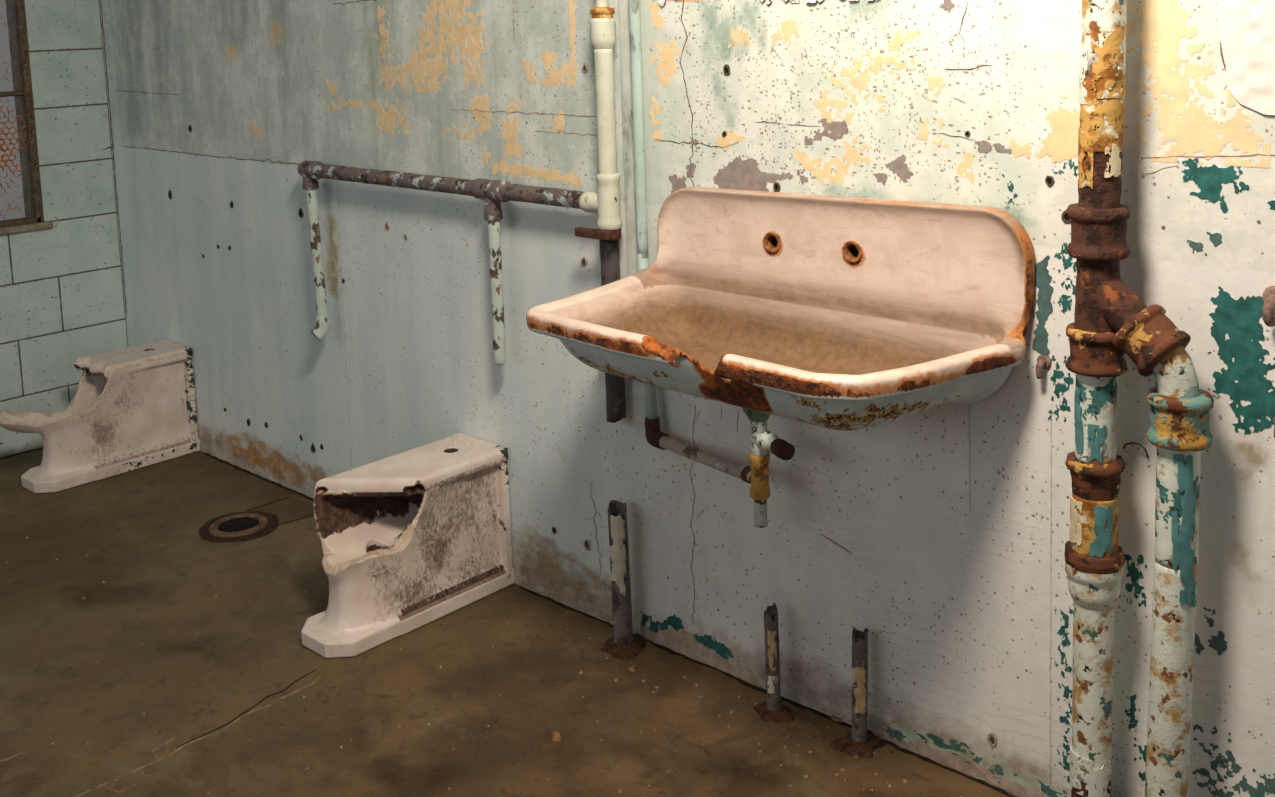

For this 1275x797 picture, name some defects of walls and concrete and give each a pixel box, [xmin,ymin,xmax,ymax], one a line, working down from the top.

crack [656,0,805,186]
peeling [713,19,949,192]
peeling [955,0,1271,213]
peeling [1208,286,1275,435]
crack [203,452,314,526]
crack [75,669,321,797]
crack [519,586,613,628]
damp [521,536,613,621]
spalling [641,612,777,694]
crack [642,637,1015,797]
spalling [867,606,1111,797]
peeling [1192,724,1275,797]